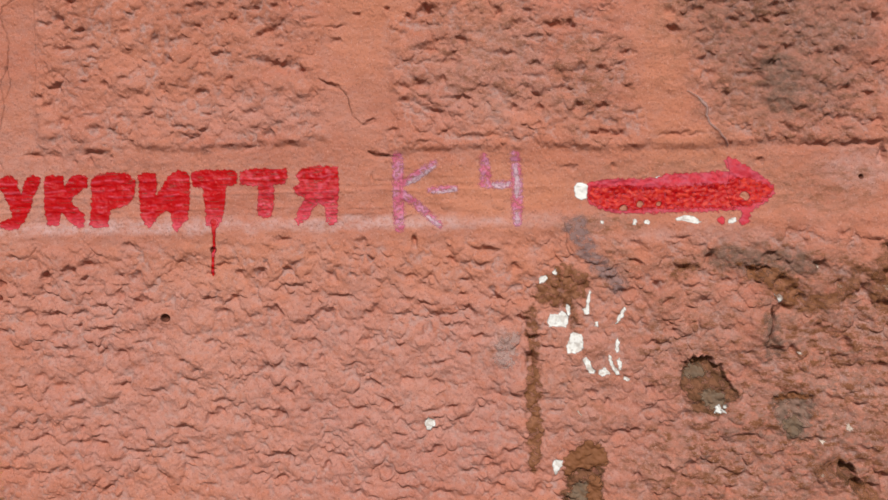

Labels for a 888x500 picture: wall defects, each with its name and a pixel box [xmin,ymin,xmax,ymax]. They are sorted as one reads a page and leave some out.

flaking render [680,356,739,417]
flaking render [772,392,818,443]
flaking render [553,440,608,500]